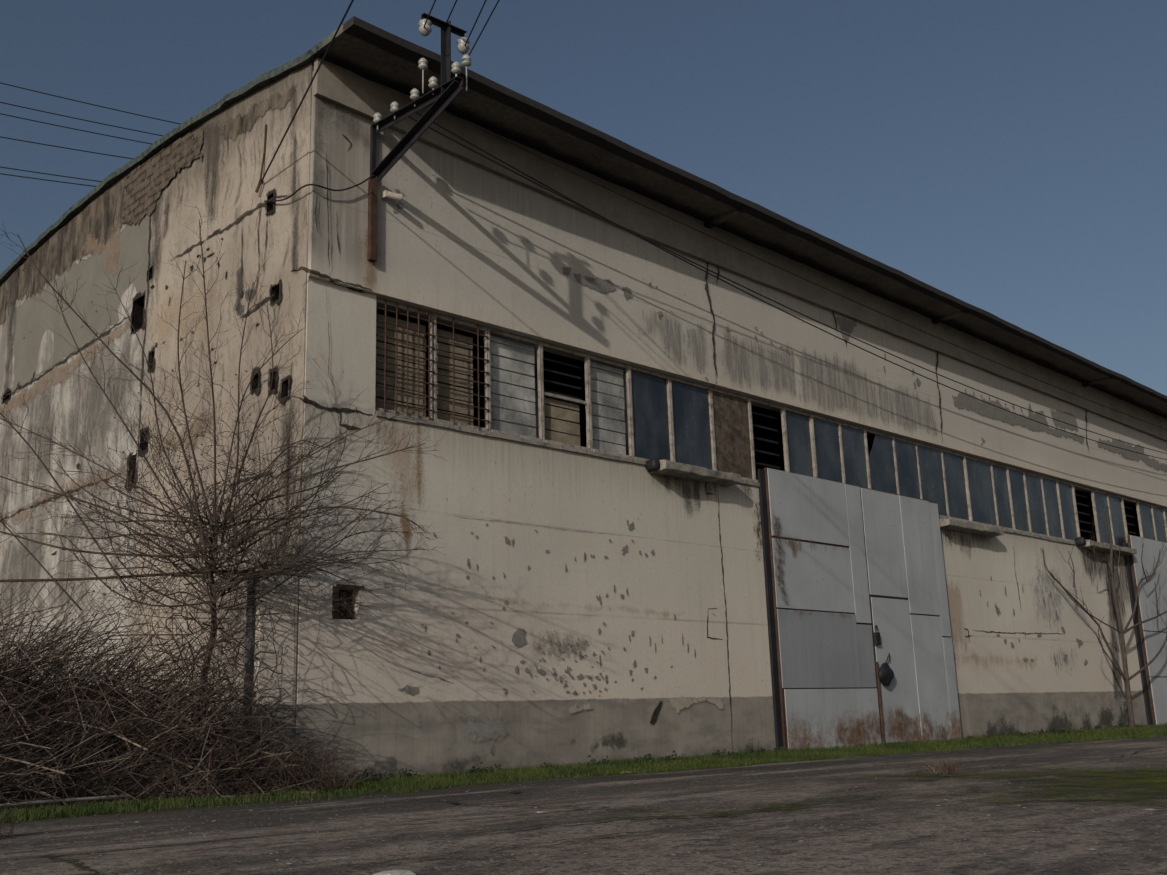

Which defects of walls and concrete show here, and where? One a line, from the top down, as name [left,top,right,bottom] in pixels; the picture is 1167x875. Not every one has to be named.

spalling [223,88,294,140]
spalling [0,128,203,335]
spalling [265,188,276,216]
crack [1,134,372,521]
peeling [563,267,632,300]
crack [705,263,720,391]
damp [0,217,130,615]
peeling [952,389,1167,473]
peeling [398,685,419,696]
peeling [512,622,657,714]
peeling [650,696,724,725]
damp [1047,550,1129,731]